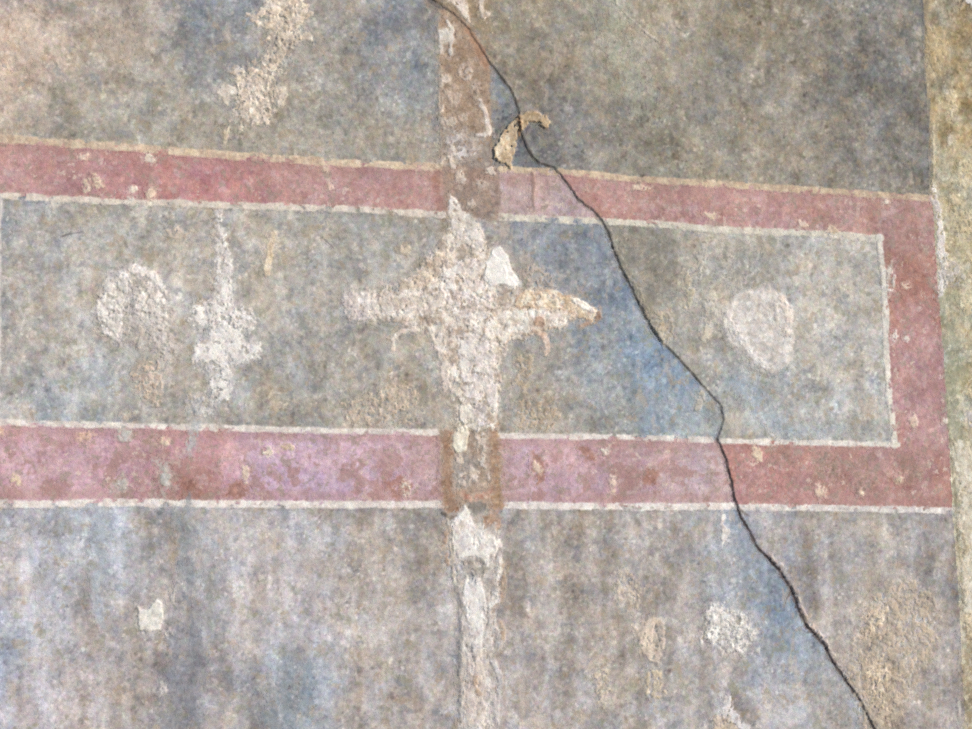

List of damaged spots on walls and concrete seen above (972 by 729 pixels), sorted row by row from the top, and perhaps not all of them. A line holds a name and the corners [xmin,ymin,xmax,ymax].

spalling [132,582,184,646]
peeling [334,0,607,458]
crack [494,66,899,729]
peeling [952,0,972,16]